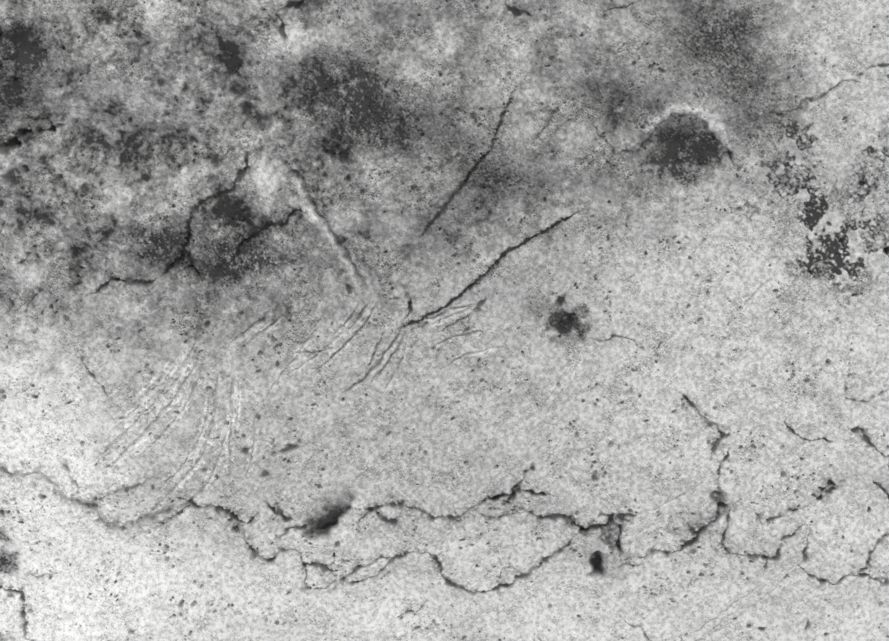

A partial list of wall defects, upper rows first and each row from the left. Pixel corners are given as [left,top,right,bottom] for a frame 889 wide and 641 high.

crack [273,0,320,45]
crack [770,62,889,118]
crack [90,152,251,297]
crack [229,206,309,265]
crack [619,374,889,590]
crack [0,456,577,600]
crack [395,600,430,621]